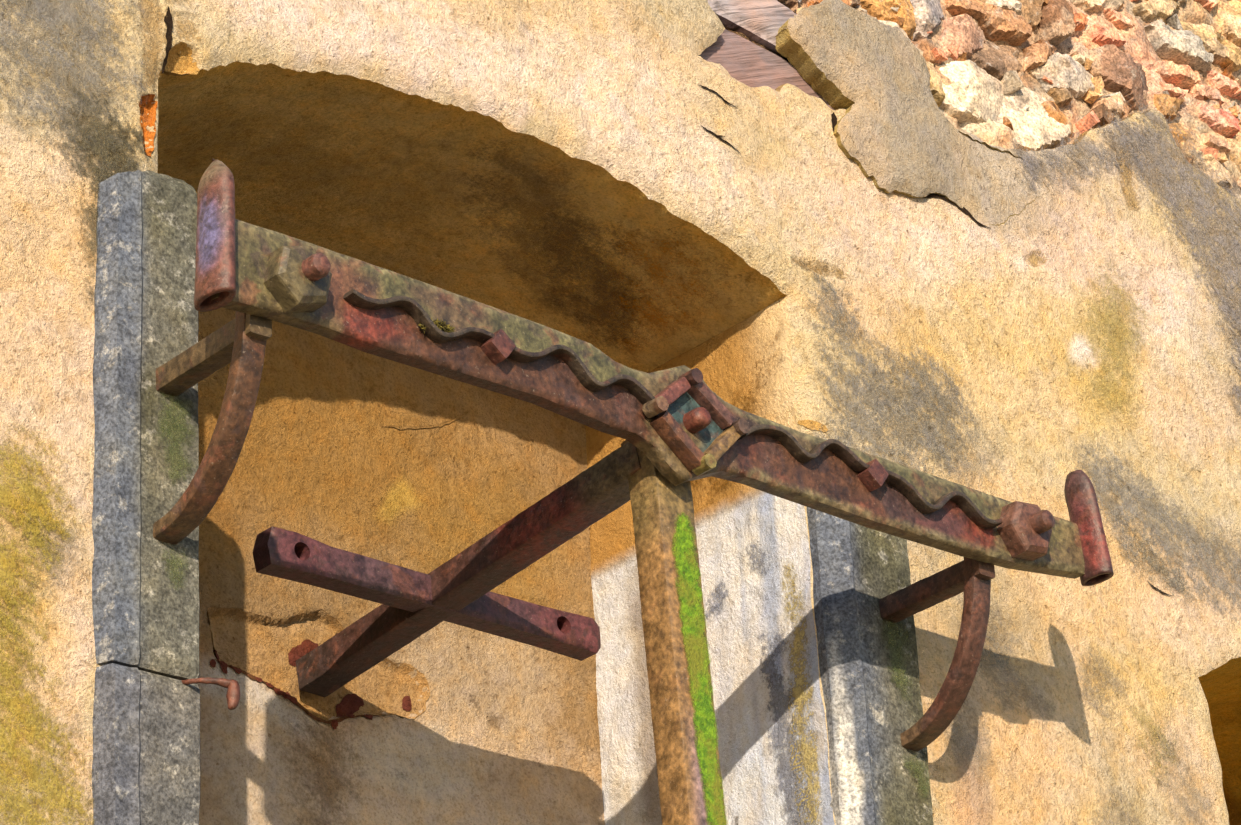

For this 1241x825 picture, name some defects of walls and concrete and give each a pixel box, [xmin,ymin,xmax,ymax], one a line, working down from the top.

crack [162,7,173,73]
crack [697,84,737,108]
crack [700,125,741,155]
crack [923,193,990,228]
spalling [207,607,430,729]